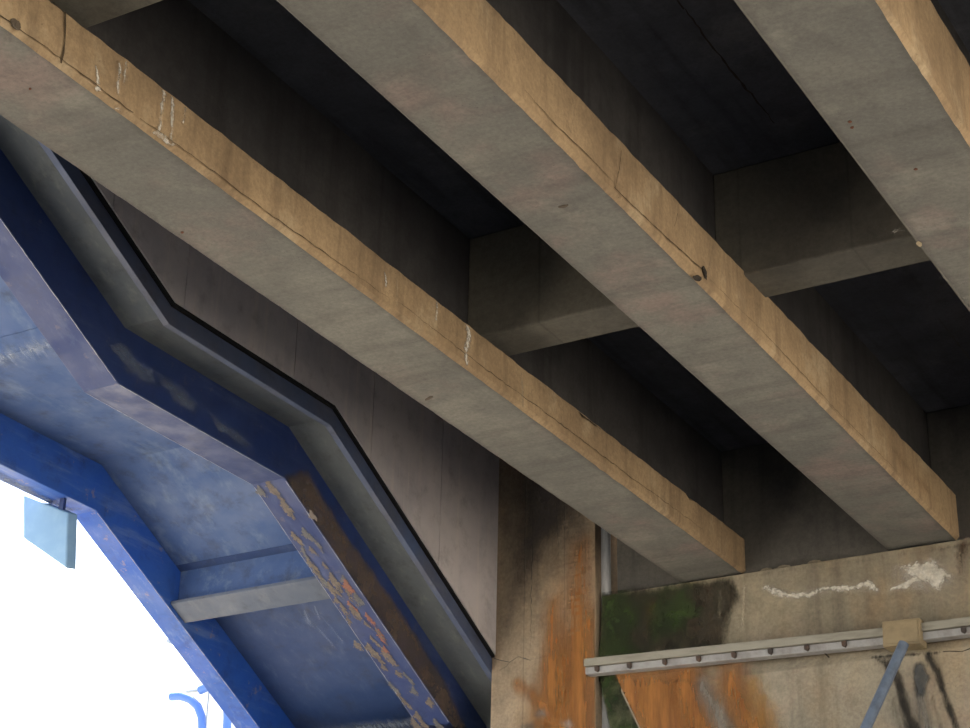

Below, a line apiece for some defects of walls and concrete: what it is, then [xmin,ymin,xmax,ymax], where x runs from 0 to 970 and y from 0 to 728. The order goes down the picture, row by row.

efflorescence [764,580,878,598]
efflorescence [890,561,951,590]
corrosion [516,542,595,728]
corrosion [615,667,765,728]
leakage [878,652,958,728]